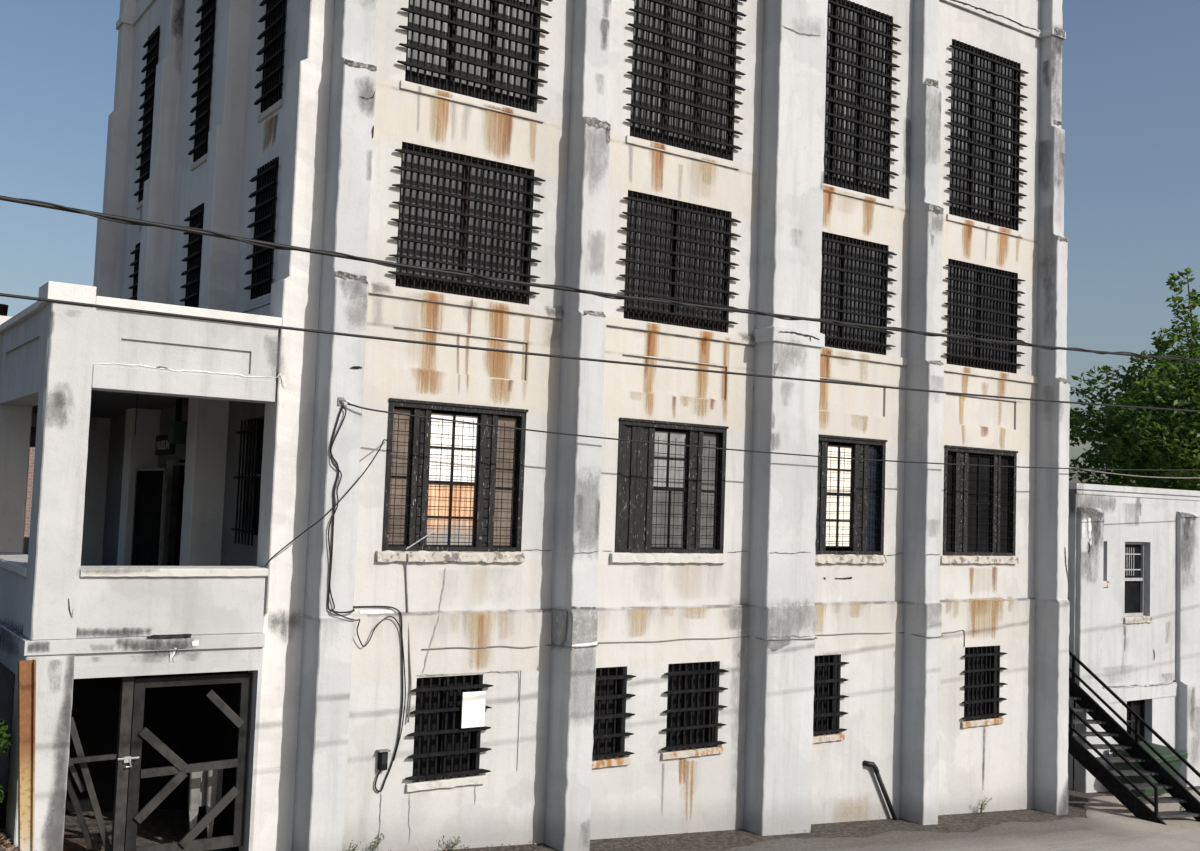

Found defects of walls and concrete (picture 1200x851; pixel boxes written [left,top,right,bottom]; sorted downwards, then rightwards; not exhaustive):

corrosion [433,90,450,139]
corrosion [490,107,513,155]
corrosion [651,141,664,188]
corrosion [823,185,835,225]
corrosion [417,292,444,391]
corrosion [487,303,530,400]
corrosion [644,323,659,413]
corrosion [673,331,729,414]
corrosion [819,346,831,424]
damp [1069,489,1115,565]
damp [1182,517,1192,556]
corrosion [970,567,1010,636]